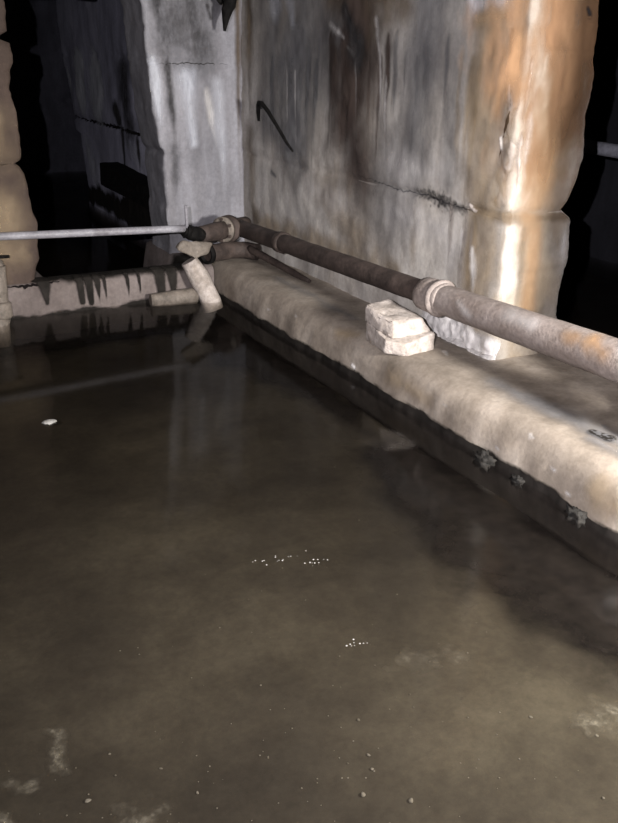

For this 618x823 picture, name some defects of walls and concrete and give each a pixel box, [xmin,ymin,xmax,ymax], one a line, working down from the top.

damp [149,57,174,122]
damp [182,70,196,146]
damp [263,0,323,171]
damp [404,0,447,182]
crack [499,89,511,155]
rust [498,0,599,310]
crack [360,176,477,222]